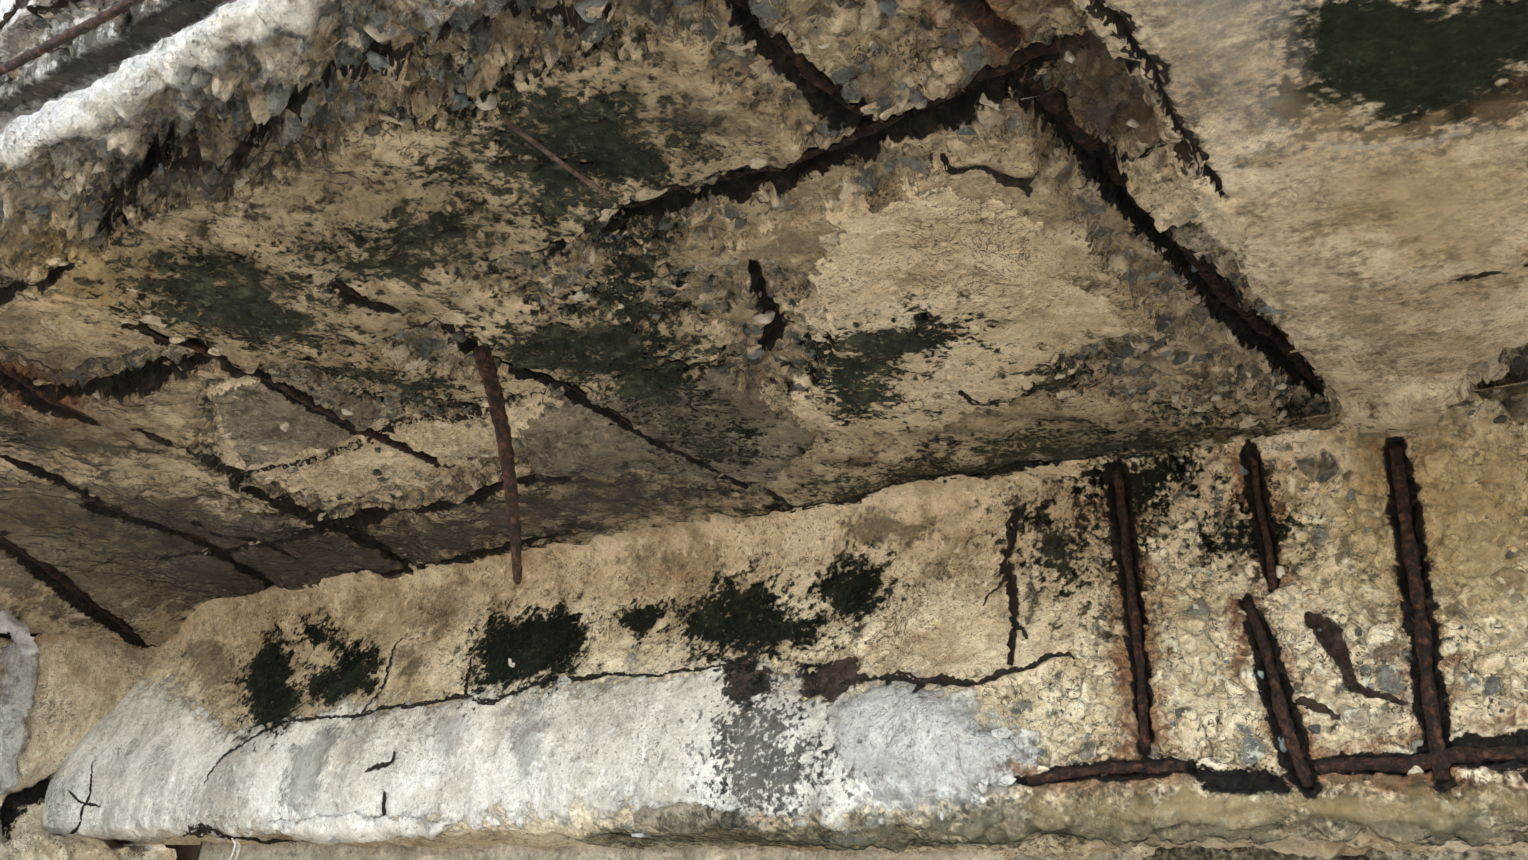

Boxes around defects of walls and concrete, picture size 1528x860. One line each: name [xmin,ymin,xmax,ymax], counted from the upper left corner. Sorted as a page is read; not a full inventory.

crack [0,0,81,29]
leakage [92,117,316,203]
leakage [1265,0,1528,157]
spalling [0,0,1342,585]
peeling [0,653,1019,846]
leakage [678,655,867,844]
crack [709,458,1088,522]
crack [838,506,1076,693]
corrosion [1017,510,1189,801]
spalling [894,342,1528,795]
corrosion [1295,696,1340,720]
corrosion [1304,611,1412,712]